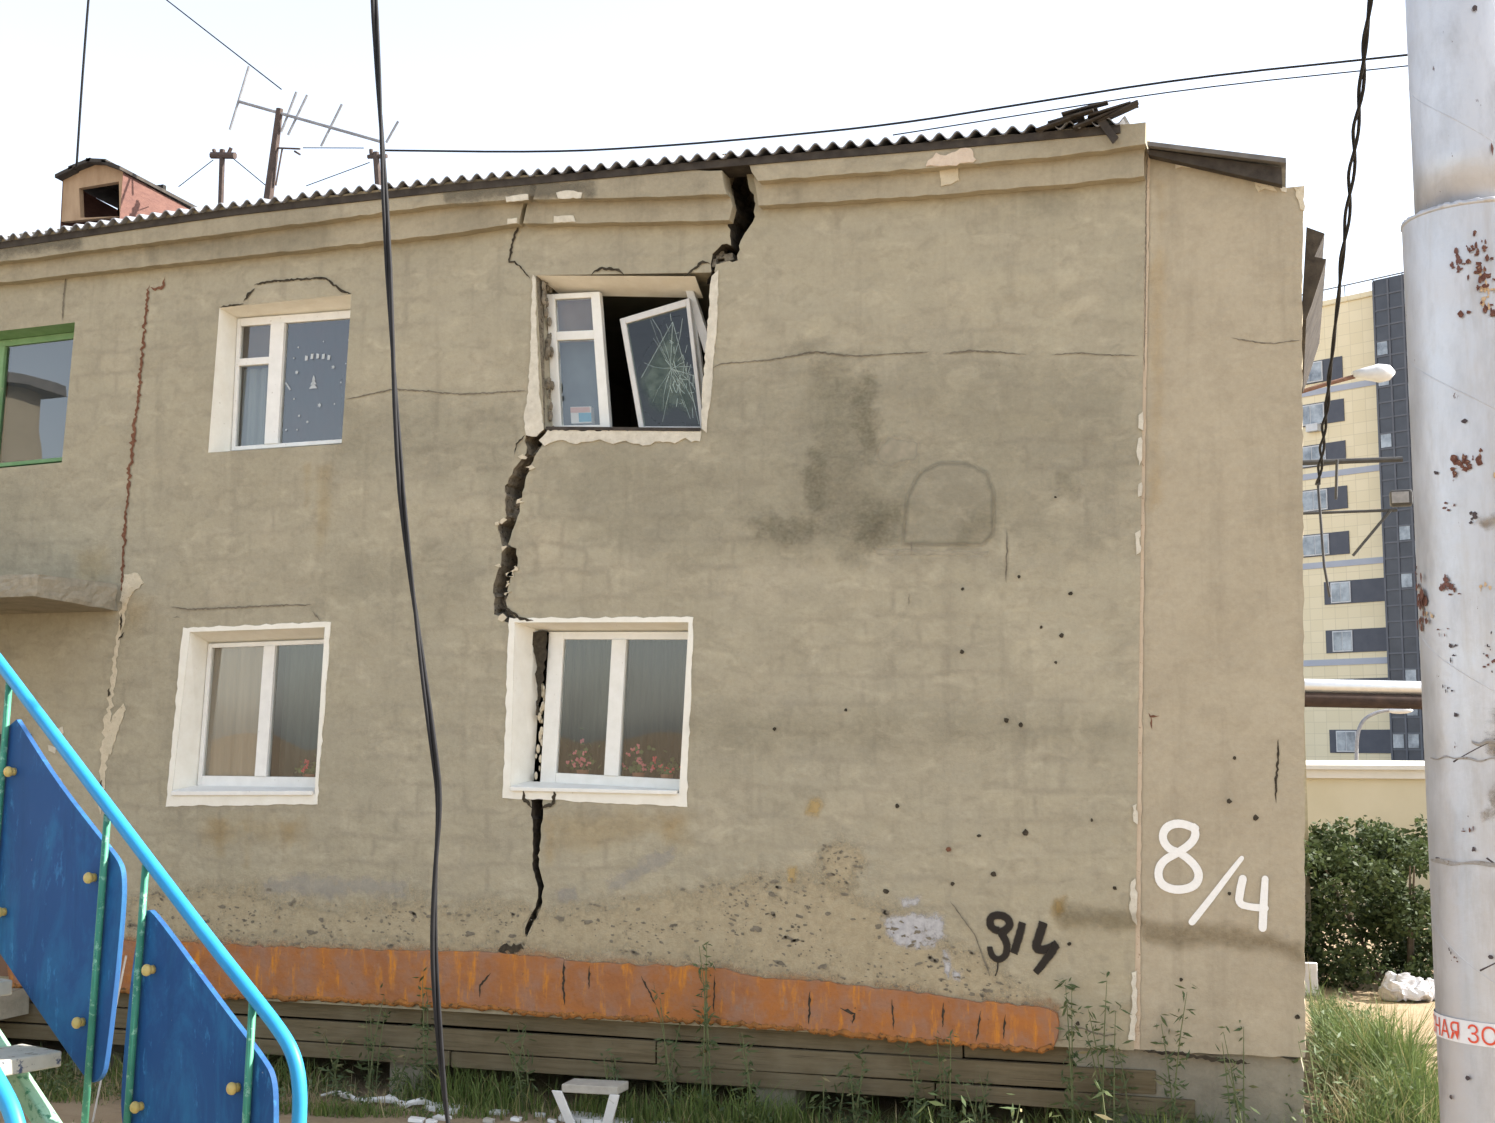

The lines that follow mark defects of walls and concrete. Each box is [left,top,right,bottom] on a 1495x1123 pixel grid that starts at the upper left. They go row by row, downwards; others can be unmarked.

crack [508,228,530,278]
crack [591,267,624,275]
crack [685,154,755,285]
corrosion [1450,230,1495,318]
crack [714,350,1017,367]
crack [120,277,165,591]
corrosion [1434,448,1495,478]
spalling [0,572,144,814]
crack [479,791,556,997]
flaking render [125,842,1034,1006]
crack [562,963,591,1004]